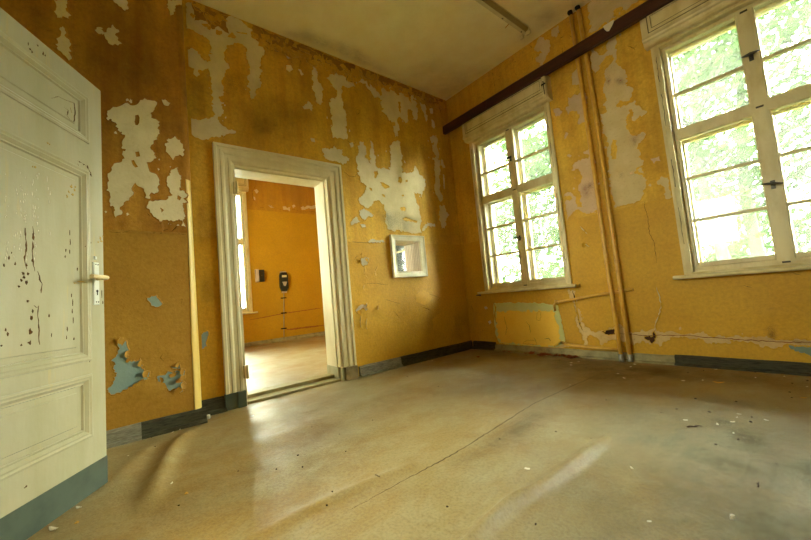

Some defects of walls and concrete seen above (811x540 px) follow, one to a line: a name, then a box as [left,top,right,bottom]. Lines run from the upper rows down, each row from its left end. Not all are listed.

peeling [52,0,74,62]
peeling [93,23,123,47]
peeling [112,0,130,12]
peeling [166,0,450,234]
peeling [553,0,673,221]
peeling [105,97,189,228]
crack [634,288,811,343]
peeling [106,337,187,396]